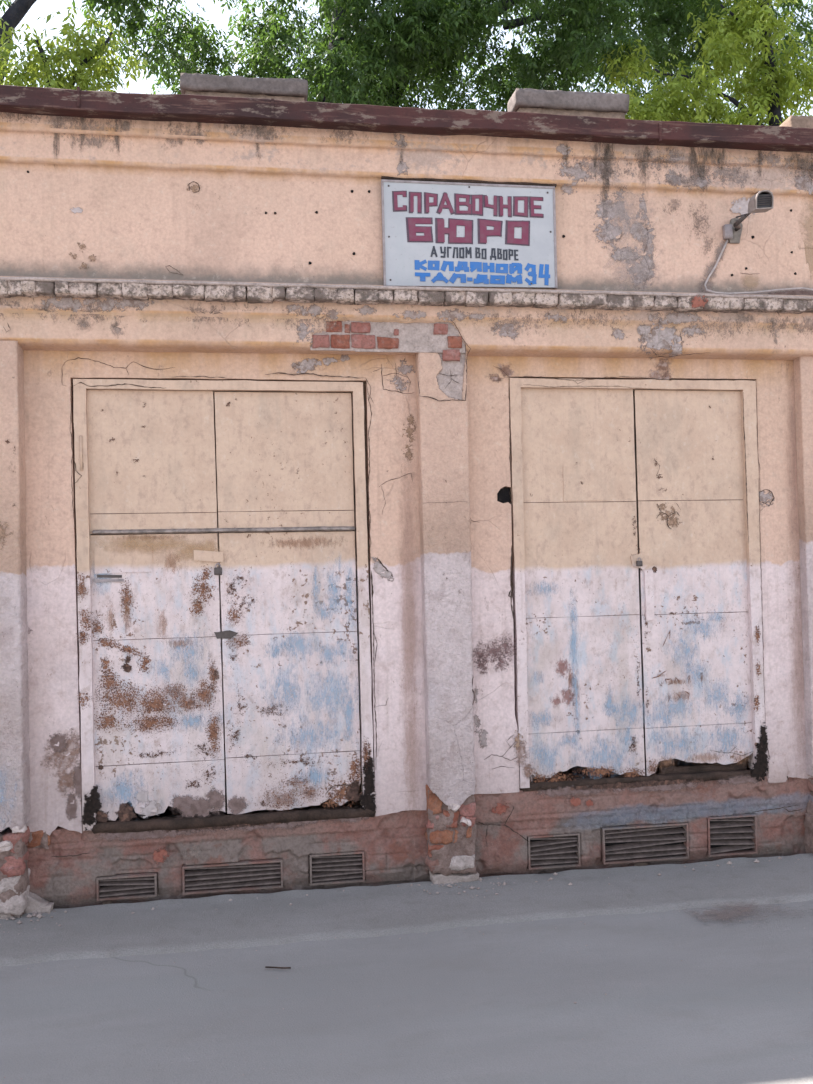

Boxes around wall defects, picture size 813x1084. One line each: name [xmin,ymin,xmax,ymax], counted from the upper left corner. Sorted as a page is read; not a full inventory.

damp [593,143,614,212]
peeling [556,143,813,290]
damp [690,149,724,189]
flaking render [283,295,813,400]
corrosion [77,564,377,831]
corrosion [543,631,604,709]
flaking render [0,826,51,917]
peeling [136,788,162,819]
flaking render [424,785,477,876]